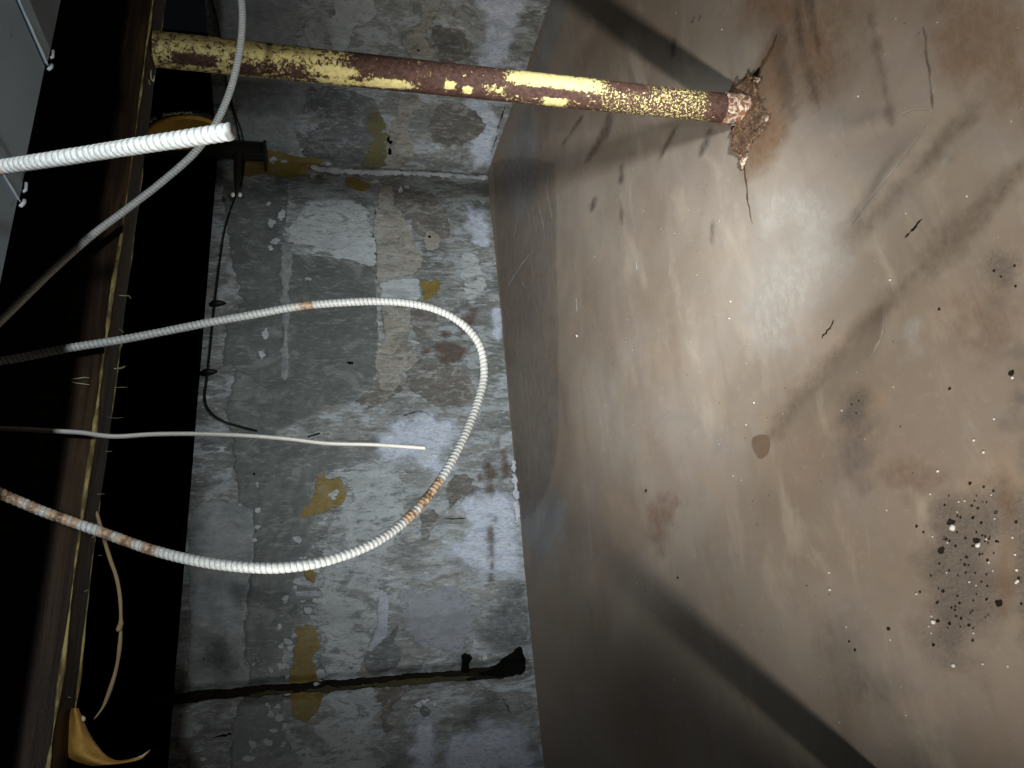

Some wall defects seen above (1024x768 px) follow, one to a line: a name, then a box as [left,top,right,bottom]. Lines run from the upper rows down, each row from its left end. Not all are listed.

efflorescence [477,0,524,67]
crack [751,35,777,81]
water stain [465,98,499,169]
spalling [730,72,771,169]
crack [743,167,752,221]
efflorescence [465,205,490,247]
efflorescence [492,308,502,339]
efflorescence [379,414,460,471]
water stain [450,492,561,574]
efflorescence [408,720,434,768]
water stain [446,703,535,768]